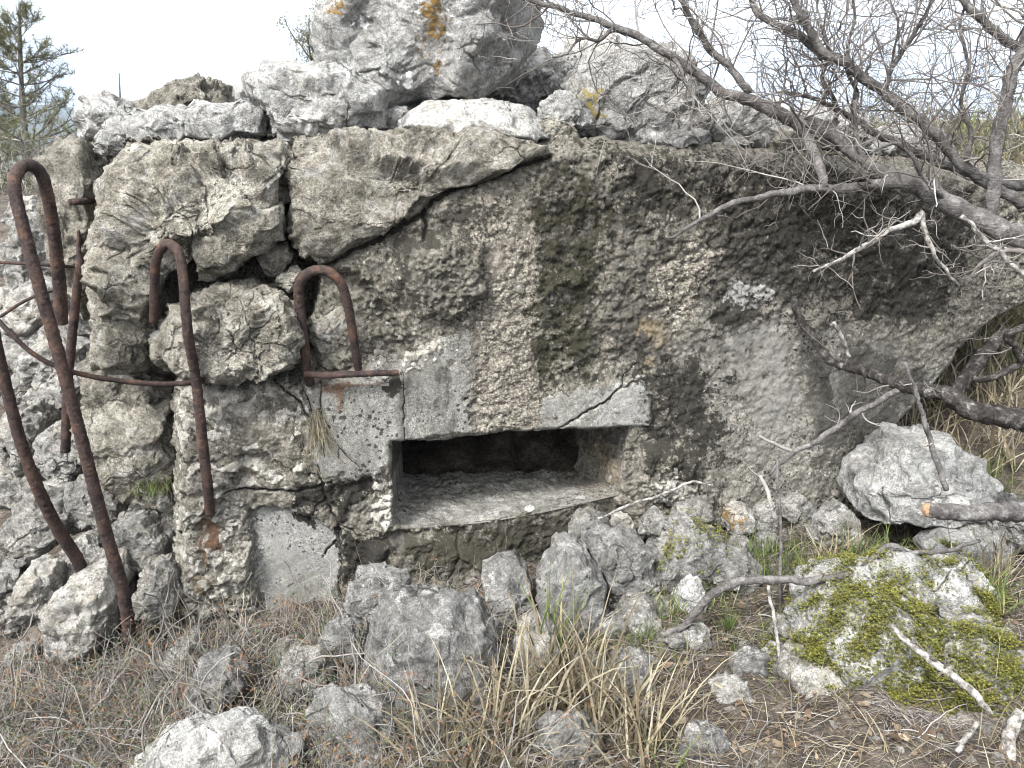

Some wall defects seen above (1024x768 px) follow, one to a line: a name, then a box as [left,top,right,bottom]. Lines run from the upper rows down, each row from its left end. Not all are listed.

rust [0,159,222,646]
rust [293,265,399,410]
leakage [376,185,514,325]
crack [558,363,641,428]
leakage [517,140,985,512]